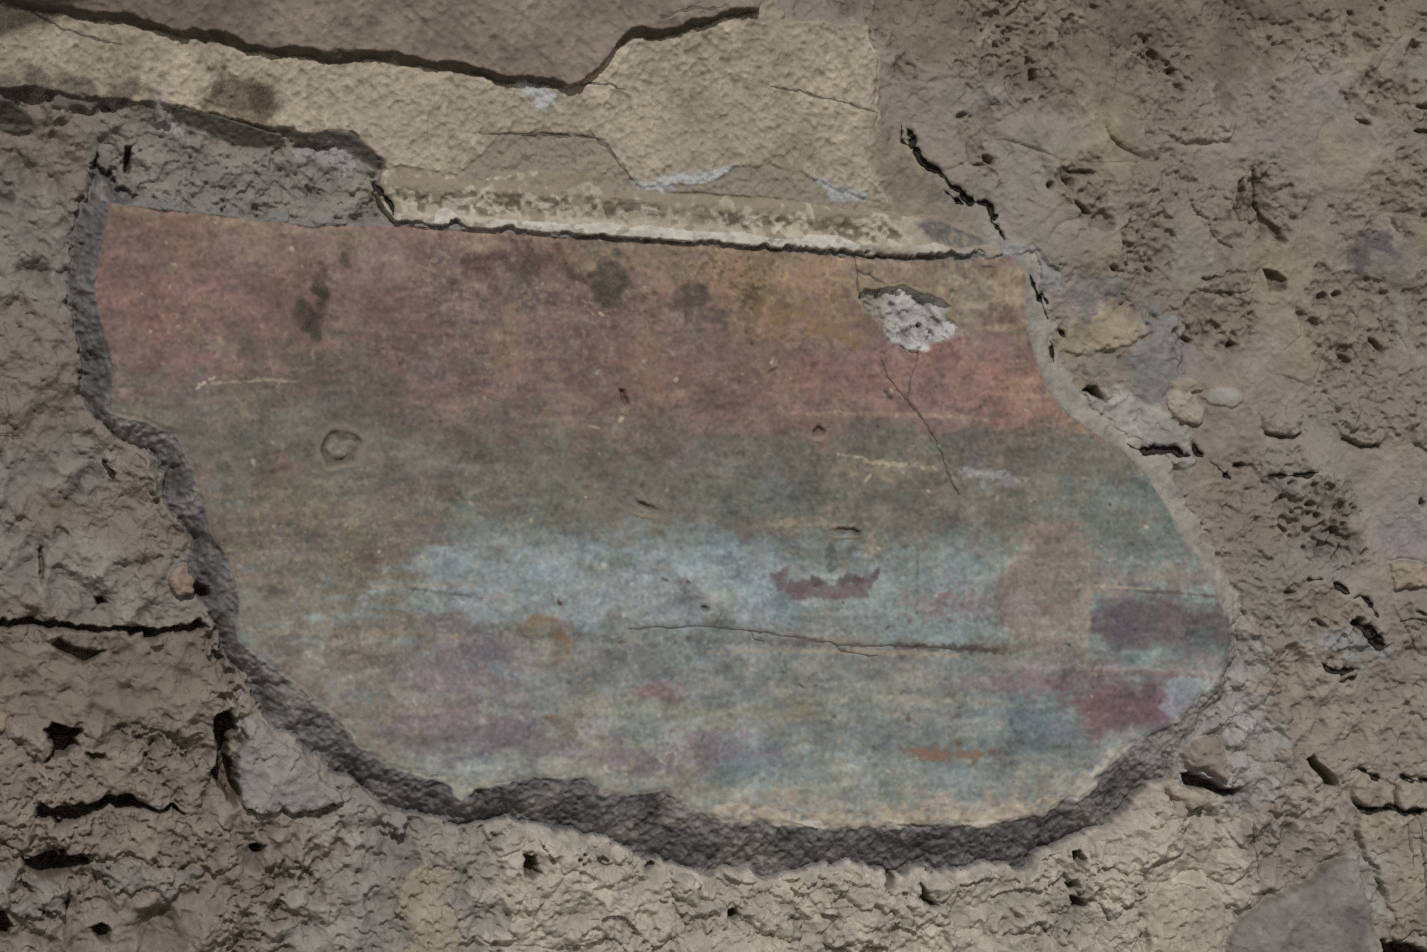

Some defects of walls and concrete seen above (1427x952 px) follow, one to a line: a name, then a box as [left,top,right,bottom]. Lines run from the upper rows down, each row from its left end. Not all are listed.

crack [2,5,123,44]
crack [574,82,626,90]
crack [770,86,1006,240]
spalling [854,280,962,351]
crack [630,612,973,656]